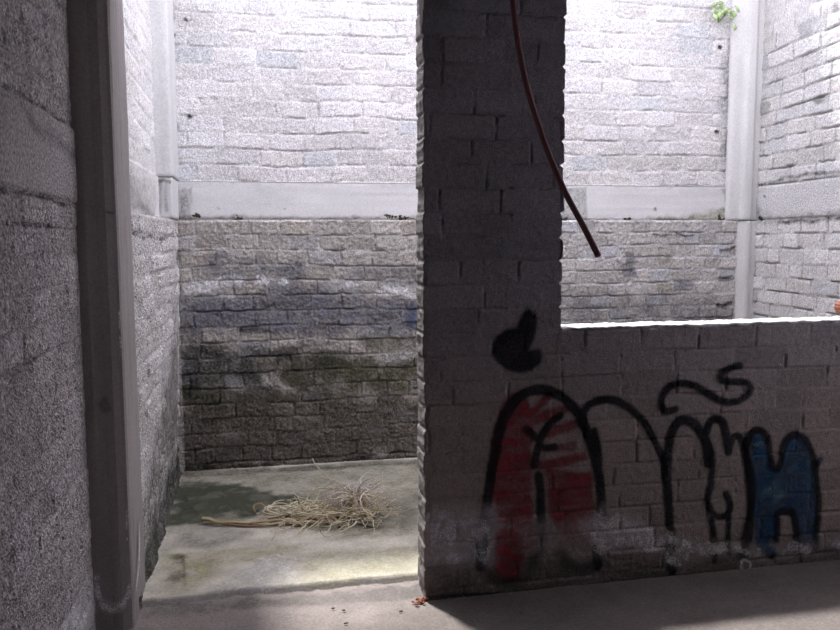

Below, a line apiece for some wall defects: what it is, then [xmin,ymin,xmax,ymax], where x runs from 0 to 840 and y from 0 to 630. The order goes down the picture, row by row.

water stain [154,231,418,494]